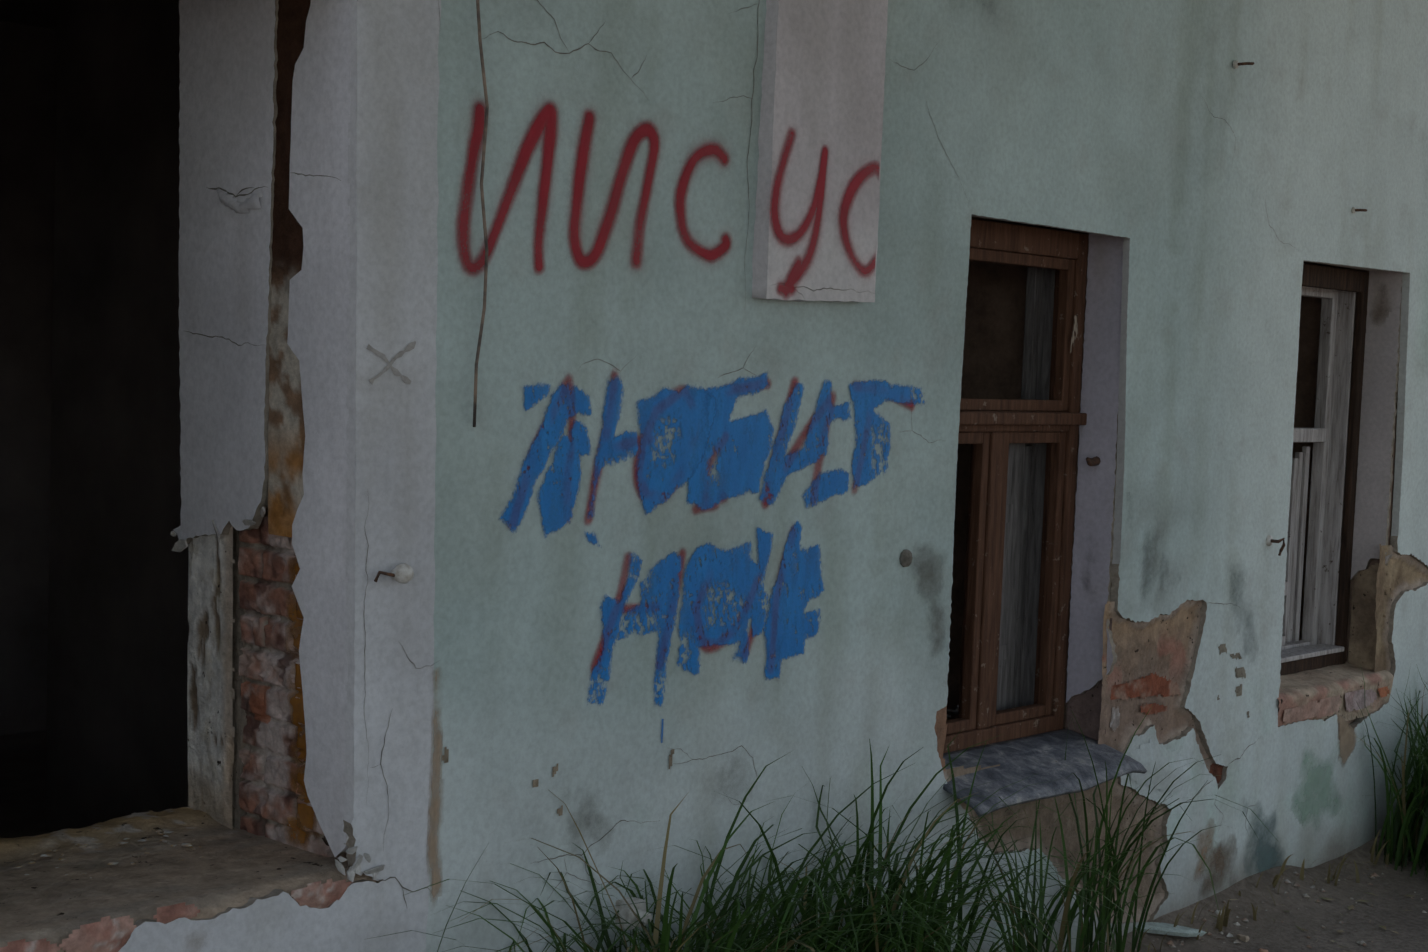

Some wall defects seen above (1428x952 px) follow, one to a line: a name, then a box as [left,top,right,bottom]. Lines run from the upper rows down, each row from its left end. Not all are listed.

crack [483,0,647,98]
flaking render [171,531,188,552]
flaking render [238,506,385,909]
flaking render [1066,599,1227,788]
peeling [1217,644,1250,718]
flaking render [1283,544,1428,723]
spalling [0,915,137,952]
spalling [153,902,200,924]